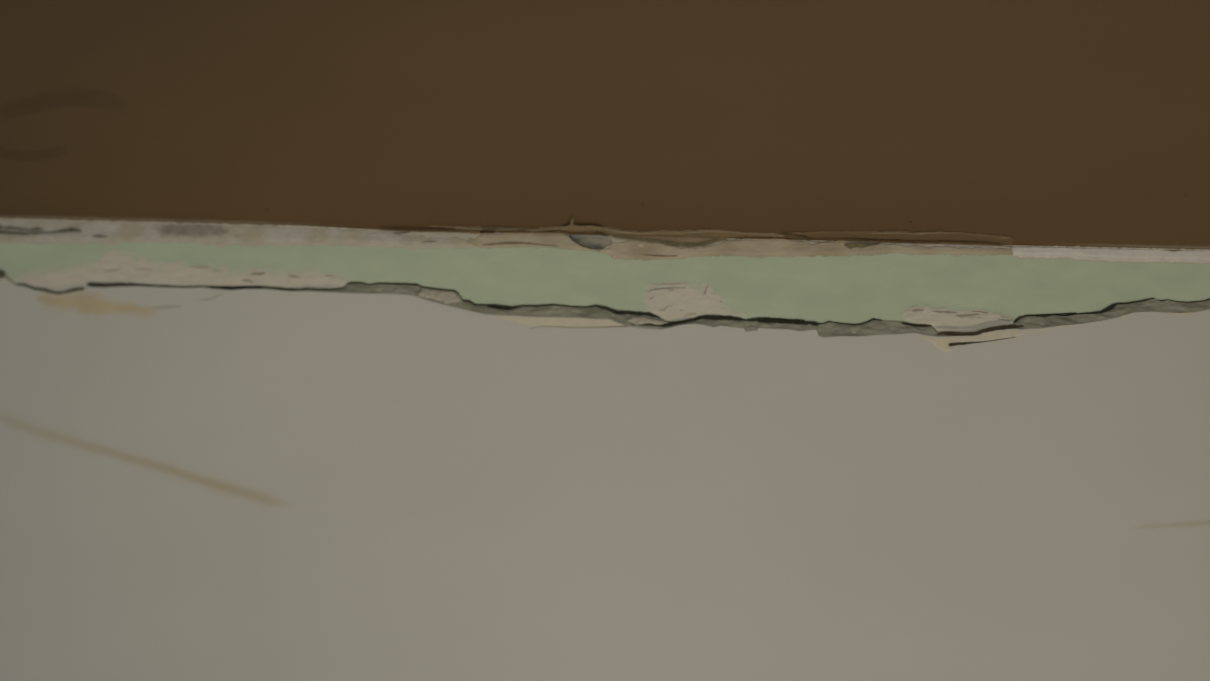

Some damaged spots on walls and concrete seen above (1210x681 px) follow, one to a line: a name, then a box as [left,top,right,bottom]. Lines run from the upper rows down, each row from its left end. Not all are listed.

spalling [0,219,1210,352]